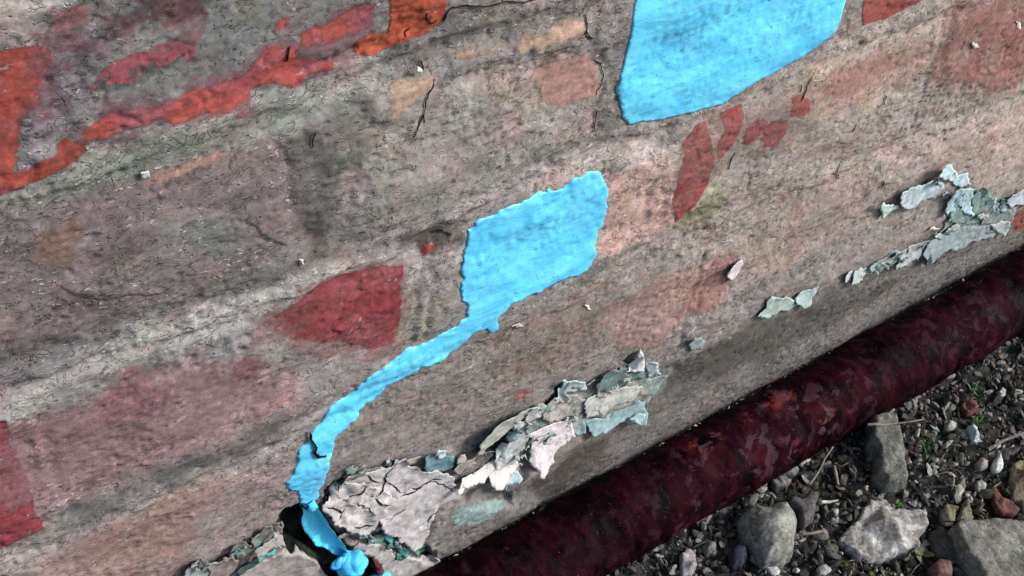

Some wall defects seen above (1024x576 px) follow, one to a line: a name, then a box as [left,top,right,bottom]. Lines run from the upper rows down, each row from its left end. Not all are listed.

crack [412,60,435,140]
crack [584,16,604,131]
peeling [844,164,1024,287]
peeling [757,286,819,319]
peeling [184,348,667,576]